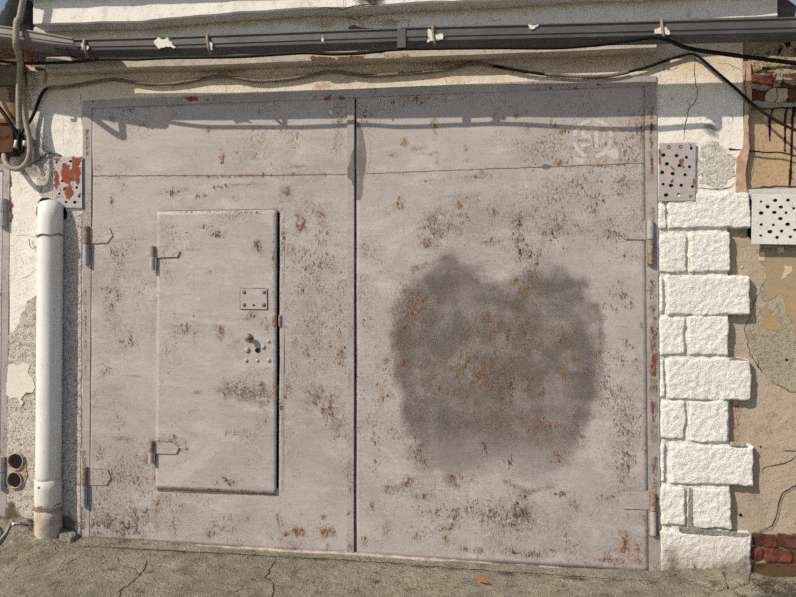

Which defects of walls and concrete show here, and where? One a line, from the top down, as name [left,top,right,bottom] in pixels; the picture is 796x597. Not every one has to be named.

crack [308,0,409,26]
crack [705,63,796,190]
spalling [749,42,796,121]
spalling [6,295,37,522]
corrosion [272,208,347,368]
corrosion [363,277,579,464]
corrosion [599,280,658,442]
peeling [746,246,796,393]
crack [89,546,654,597]
corrosion [376,474,546,542]
spalling [751,533,796,572]
crack [754,485,796,533]